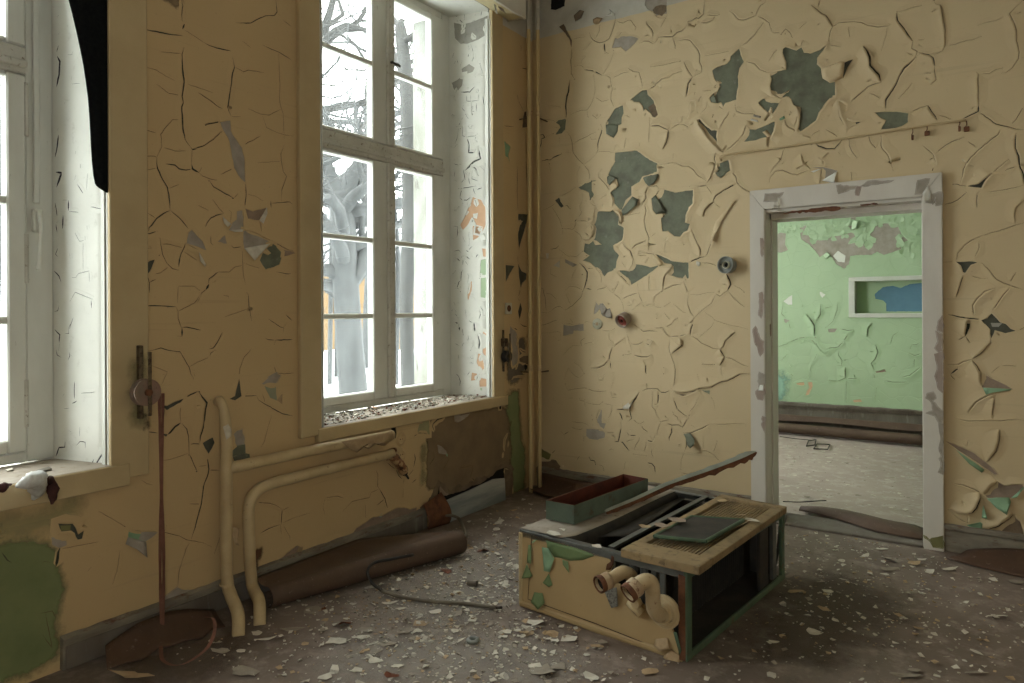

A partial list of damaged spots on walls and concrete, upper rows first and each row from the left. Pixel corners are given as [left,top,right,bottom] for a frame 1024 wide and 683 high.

peeling [689,37,858,184]
peeling [868,106,917,137]
crack [147,0,292,586]
peeling [237,203,285,278]
peeling [457,194,486,304]
peeling [565,84,702,290]
crack [450,0,1024,531]
peeling [763,164,944,270]
peeling [978,308,1020,339]
peeling [925,316,1024,534]
spalling [420,462,514,509]